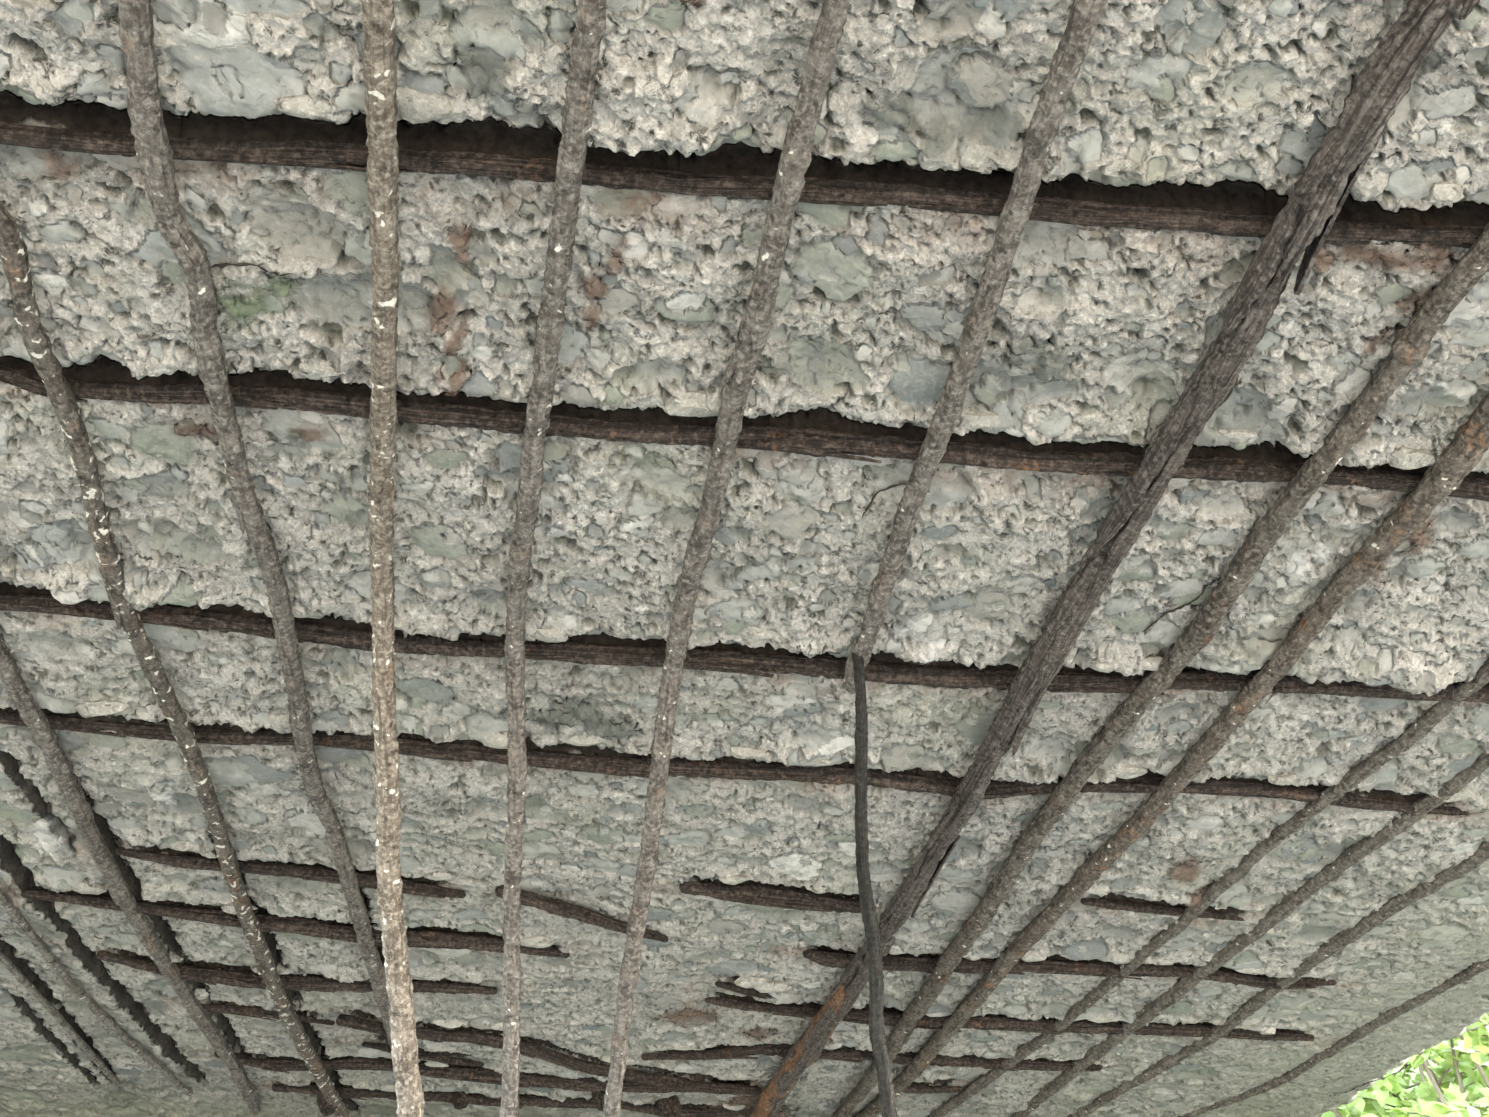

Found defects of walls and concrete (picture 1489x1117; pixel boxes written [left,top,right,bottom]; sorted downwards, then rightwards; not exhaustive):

rust [581,243,628,330]
rust [429,292,468,395]
rust [175,423,218,443]
spalling [0,582,114,620]
spalling [621,653,899,1117]
rust [1170,860,1216,907]
spalling [405,925,504,953]
spalling [1007,959,1142,980]
spalling [1067,841,1489,1117]
rust [655,1007,719,1026]
rust [742,1026,778,1041]
spalling [961,977,1124,1035]